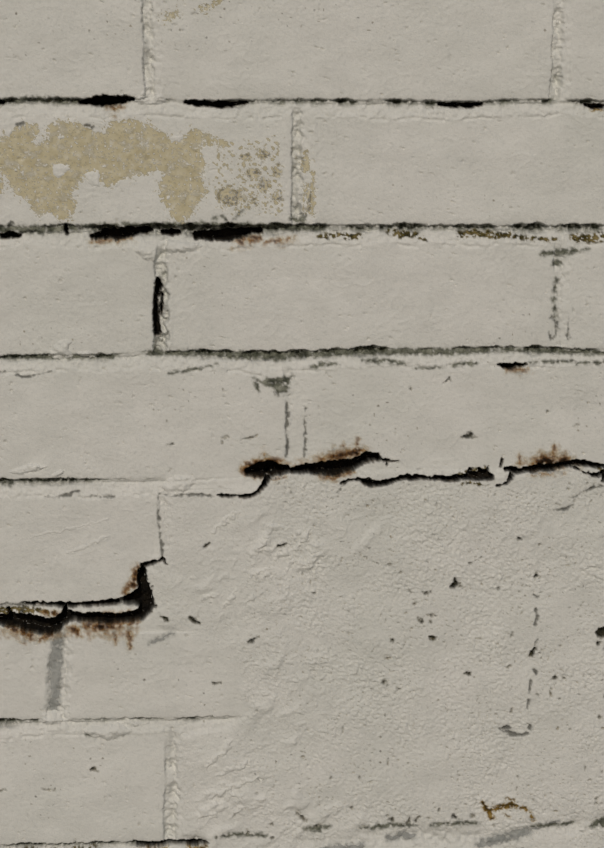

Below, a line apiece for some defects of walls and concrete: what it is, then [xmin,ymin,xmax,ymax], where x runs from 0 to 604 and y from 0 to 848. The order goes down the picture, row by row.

peeling [0,118,283,224]
peeling [300,150,318,215]
rust [320,438,366,462]
crack [340,458,604,490]
rust [530,445,570,476]
rust [122,565,140,595]
rust [68,613,139,649]